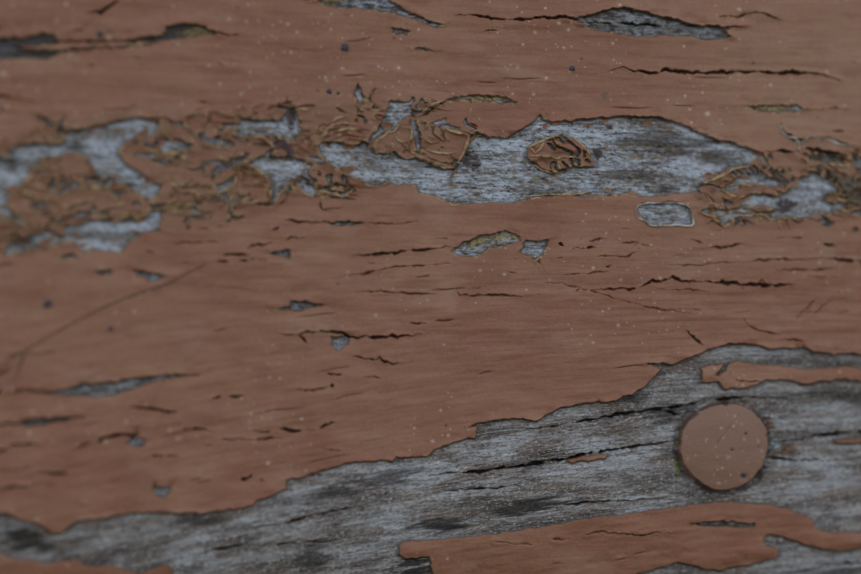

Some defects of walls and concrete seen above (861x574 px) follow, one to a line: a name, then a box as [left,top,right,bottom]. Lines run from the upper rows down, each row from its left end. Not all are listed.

peeling [0,21,219,63]
peeling [312,0,447,55]
peeling [568,4,749,43]
crack [611,66,841,82]
peeling [0,80,861,269]
crack [343,238,521,298]
crack [537,238,861,347]
peeling [327,333,353,355]
crack [279,319,456,393]
crack [524,378,793,431]
peeling [0,340,861,574]
crack [428,440,677,493]